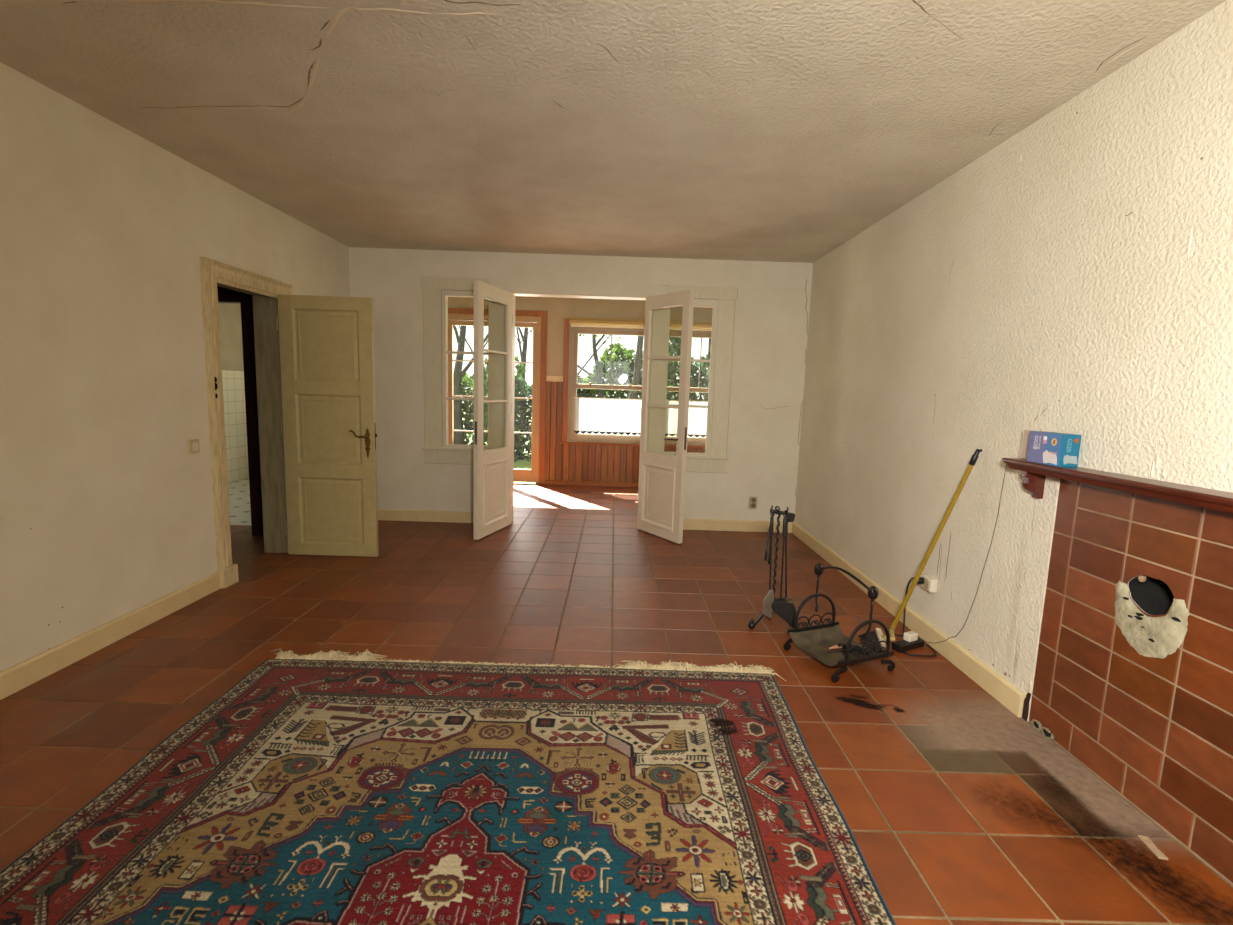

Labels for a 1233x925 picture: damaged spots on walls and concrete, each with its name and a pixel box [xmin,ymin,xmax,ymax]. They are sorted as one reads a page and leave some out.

crack [126,0,522,111]
crack [912,0,963,40]